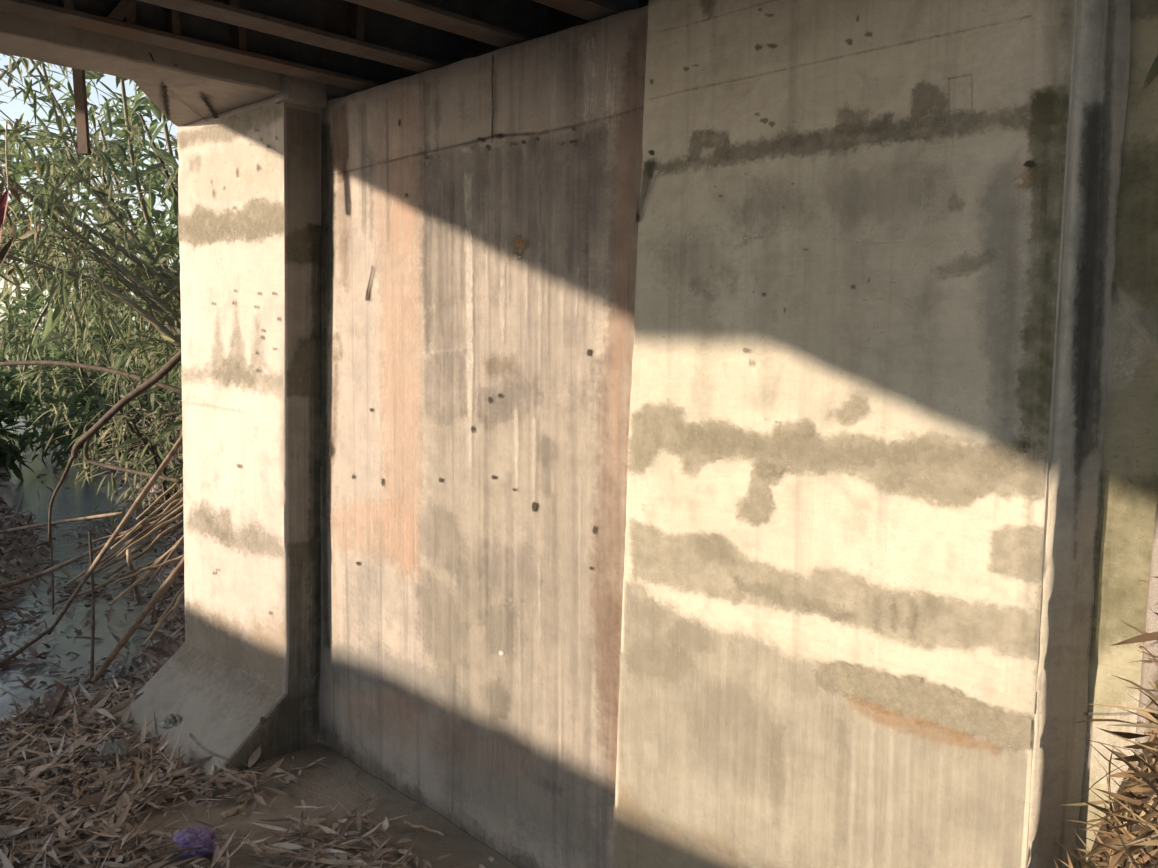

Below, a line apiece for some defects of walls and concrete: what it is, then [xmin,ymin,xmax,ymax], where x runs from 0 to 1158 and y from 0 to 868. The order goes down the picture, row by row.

leakage [647,83,1069,176]
leakage [1074,50,1112,464]
leakage [178,106,420,799]
leakage [629,396,1045,524]
leakage [620,588,1032,868]